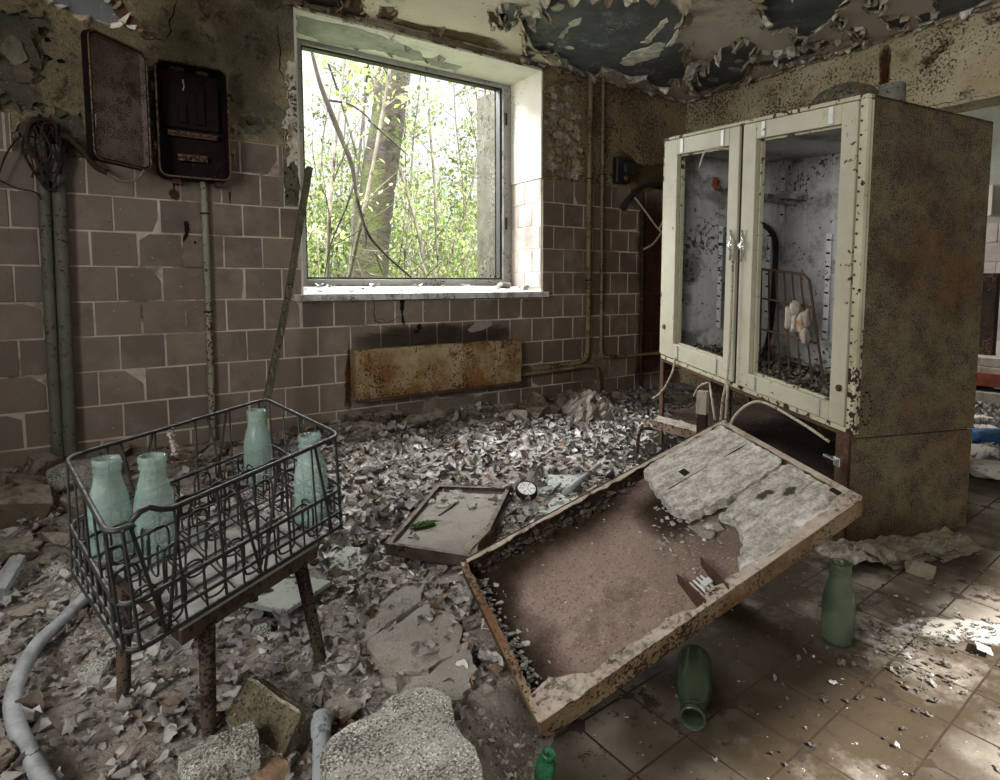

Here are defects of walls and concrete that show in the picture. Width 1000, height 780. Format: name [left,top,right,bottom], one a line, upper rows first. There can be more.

spalling [0,0,143,158]
peeling [271,0,462,74]
peeling [470,0,1000,180]
damp [620,151,664,190]